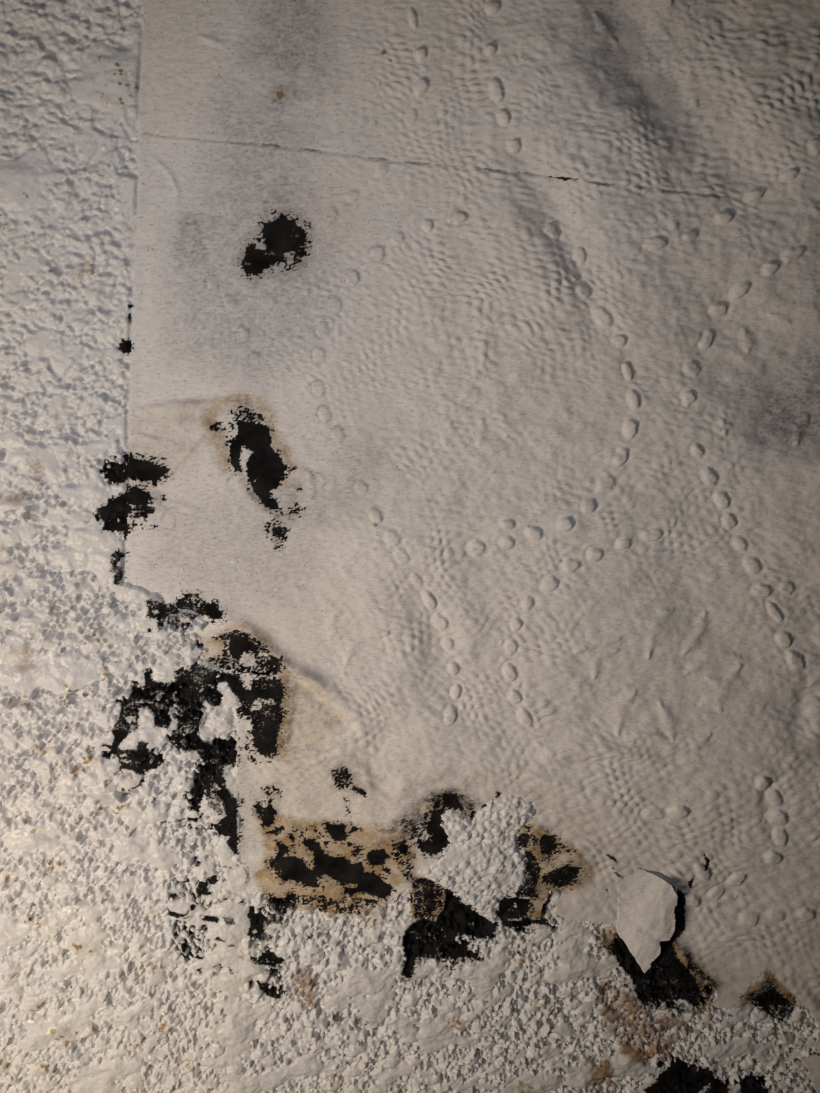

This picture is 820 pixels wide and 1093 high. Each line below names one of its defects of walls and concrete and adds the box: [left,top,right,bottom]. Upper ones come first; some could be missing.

mould [237,209,312,281]
mould [92,452,172,585]
mould [205,396,306,551]
leakage [100,590,501,1005]
mould [496,823,592,934]
leakage [590,1060,614,1093]
leakage [596,929,772,1093]
leakage [740,971,799,1022]